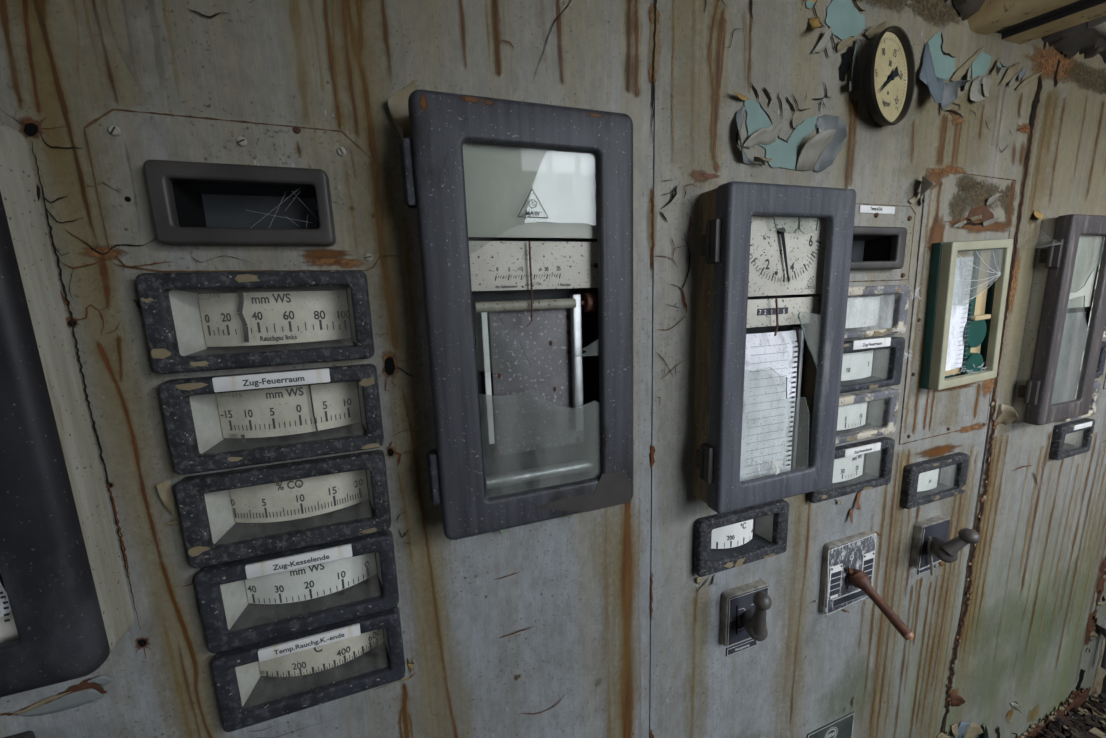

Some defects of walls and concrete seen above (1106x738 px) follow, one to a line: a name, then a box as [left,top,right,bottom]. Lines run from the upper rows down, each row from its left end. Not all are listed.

rust [627,0,660,96]
peeling [806,0,889,91]
peeling [919,31,1044,117]
peeling [733,91,848,172]
rust [0,0,399,379]
peeling [952,193,1003,229]
rust [856,109,1016,738]
rust [97,338,212,738]
rust [1046,441,1106,657]
rust [622,502,632,738]
peeling [0,676,112,716]
peeling [937,669,1091,738]